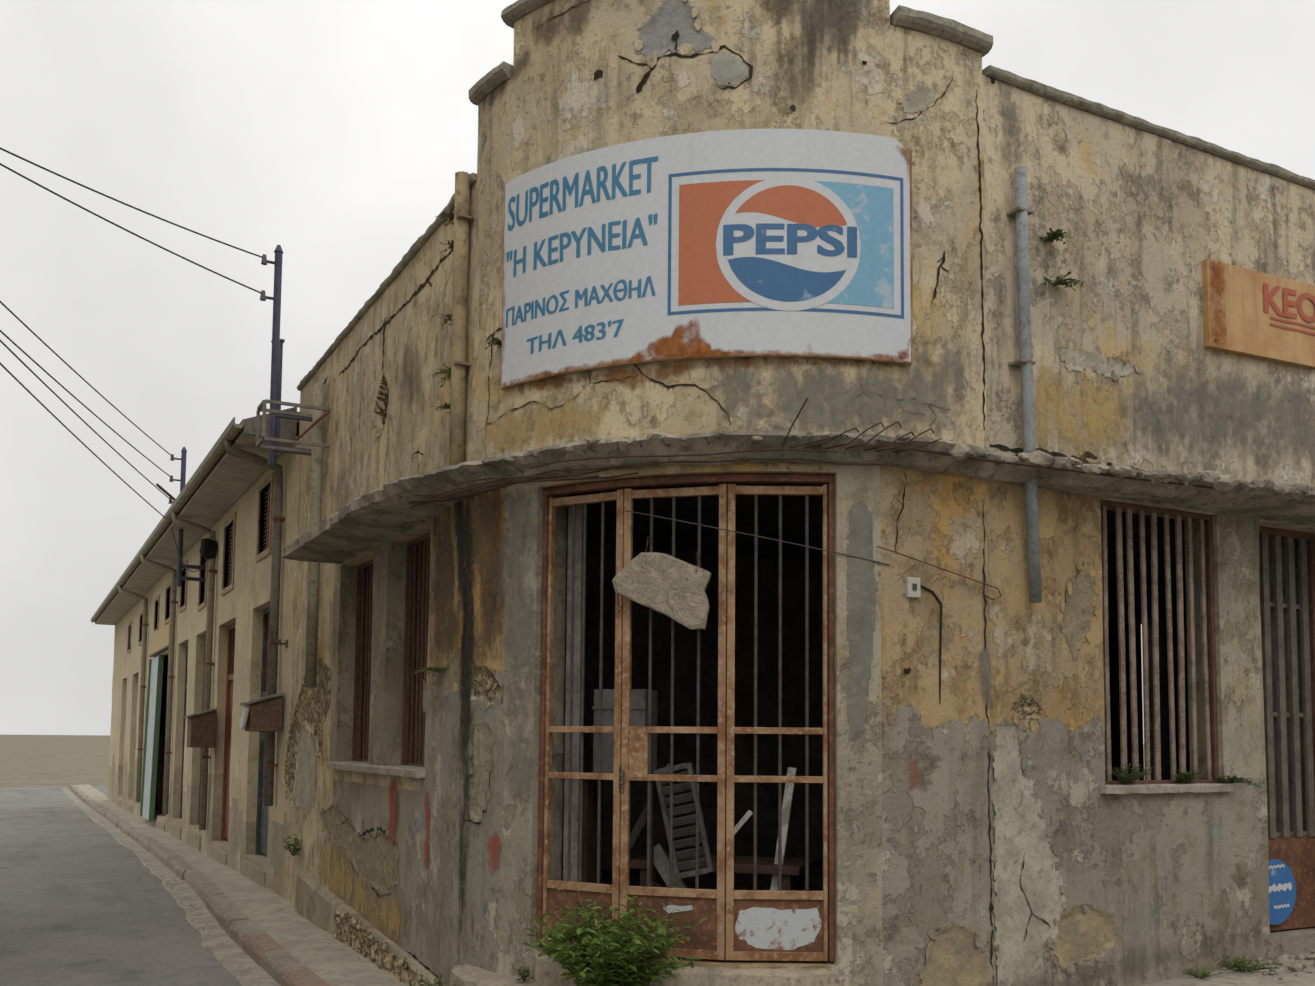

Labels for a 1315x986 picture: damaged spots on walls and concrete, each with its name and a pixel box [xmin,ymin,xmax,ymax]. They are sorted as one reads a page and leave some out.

peeling [633,0,720,68]
crack [618,39,753,93]
leakage [767,0,869,95]
leakage [999,81,1020,162]
crack [323,251,451,384]
spalling [373,370,389,439]
crack [485,327,731,438]
leakage [1035,365,1315,466]
spalling [284,645,331,804]
spalling [427,645,503,823]
leakage [430,490,536,931]
peeling [920,698,1122,986]